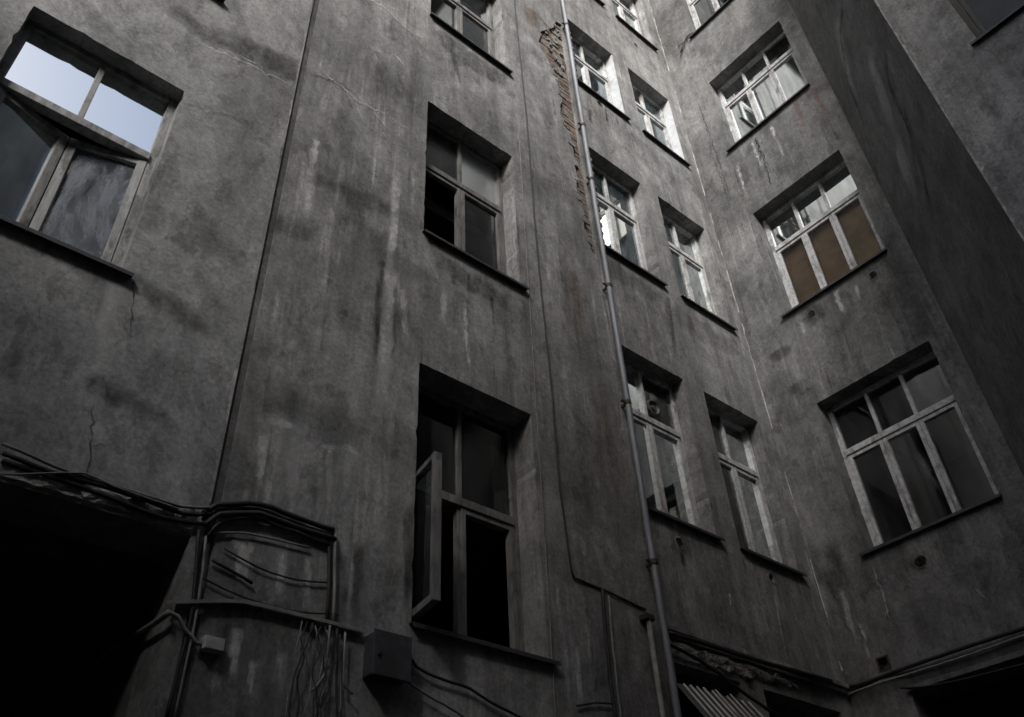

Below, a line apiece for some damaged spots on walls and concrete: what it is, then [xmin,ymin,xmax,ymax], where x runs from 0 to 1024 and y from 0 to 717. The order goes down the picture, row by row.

damp [305,140,319,212]
damp [374,176,407,380]
flaking render [539,23,605,254]
crack [648,0,773,429]
crack [86,406,103,476]
crack [810,559,826,613]